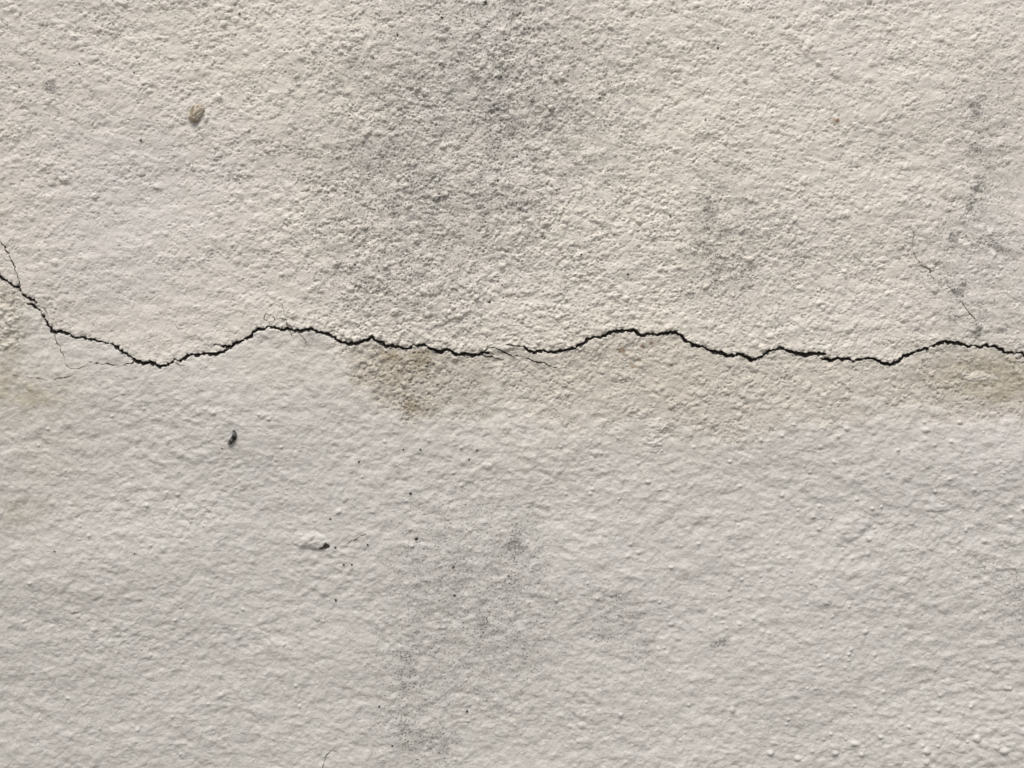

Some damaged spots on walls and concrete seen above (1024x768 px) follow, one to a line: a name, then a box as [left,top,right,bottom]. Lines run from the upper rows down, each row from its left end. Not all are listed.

crack [0,229,1024,380]